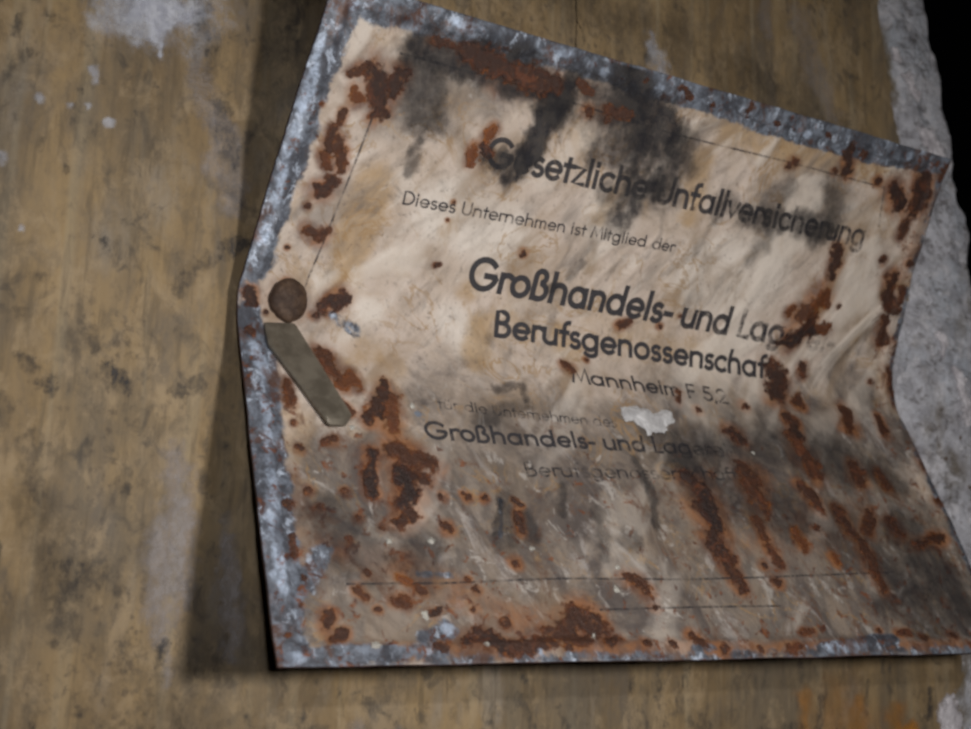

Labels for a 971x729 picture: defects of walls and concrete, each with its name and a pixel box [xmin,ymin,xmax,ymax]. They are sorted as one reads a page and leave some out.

damp [125,0,205,57]